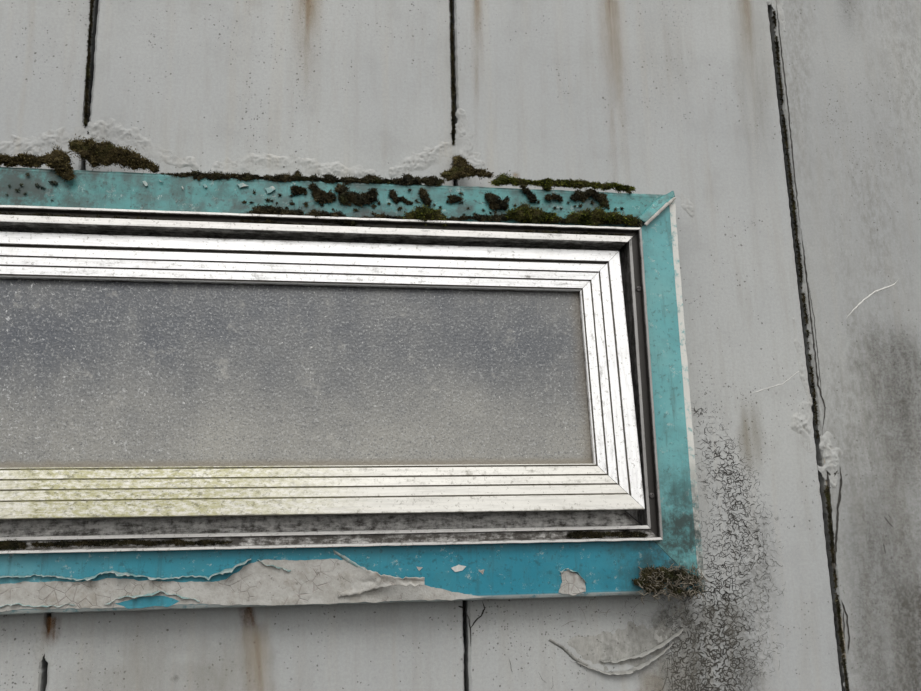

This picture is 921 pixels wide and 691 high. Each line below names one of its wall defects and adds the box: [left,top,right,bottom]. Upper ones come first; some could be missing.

peeling [0,550,485,612]
peeling [559,568,587,596]
peeling [549,620,683,676]